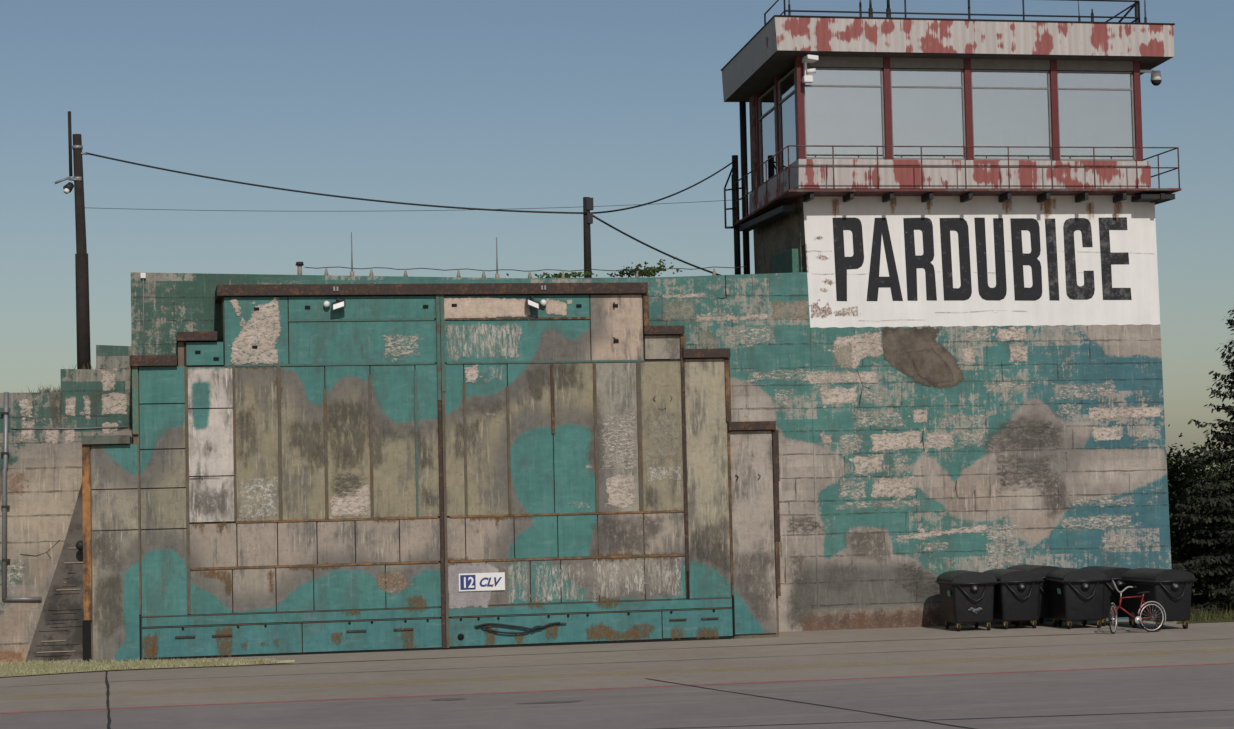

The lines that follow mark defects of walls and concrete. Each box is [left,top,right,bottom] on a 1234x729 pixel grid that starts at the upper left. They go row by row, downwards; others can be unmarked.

peeling [226,297,281,365]
peeling [382,334,419,361]
peeling [444,297,572,383]
peeling [662,279,861,347]
leakage [881,326,964,389]
peeling [959,327,1028,365]
peeling [16,367,128,446]
peeling [746,329,986,510]
peeling [1050,380,1164,441]
peeling [891,524,1020,571]
peeling [1055,495,1140,549]
peeling [448,558,684,609]